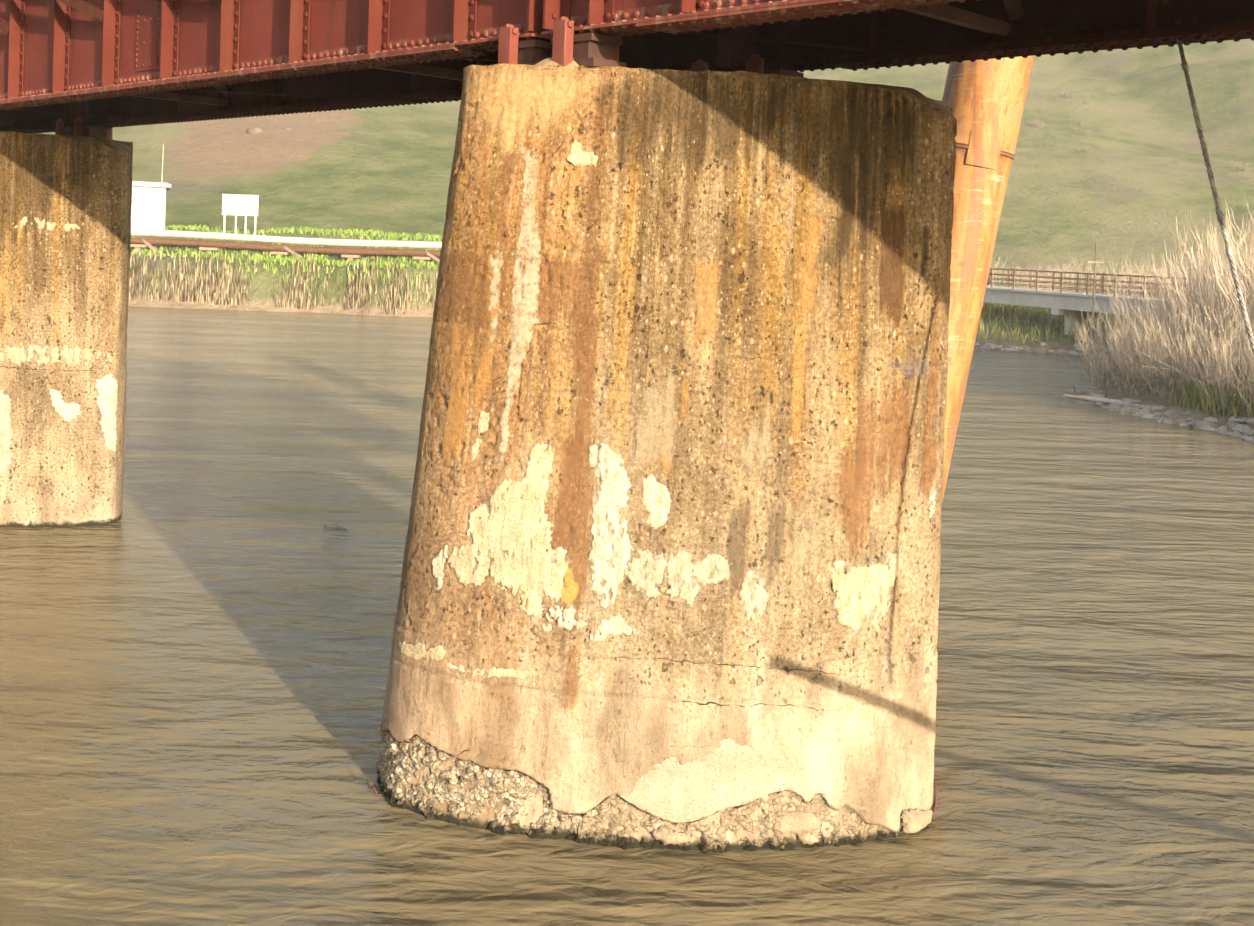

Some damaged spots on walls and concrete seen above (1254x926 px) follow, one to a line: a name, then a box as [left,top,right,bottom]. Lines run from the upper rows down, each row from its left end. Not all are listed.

leakage [610,77,915,255]
peeling [12,217,80,231]
rust [696,262,716,338]
rust [802,221,822,311]
peeling [0,389,13,476]
peeling [0,343,118,451]
rust [792,352,804,436]
peeling [429,433,769,642]
peeling [827,548,903,639]
crack [611,657,845,675]
crack [670,700,840,711]
spalling [376,723,917,853]